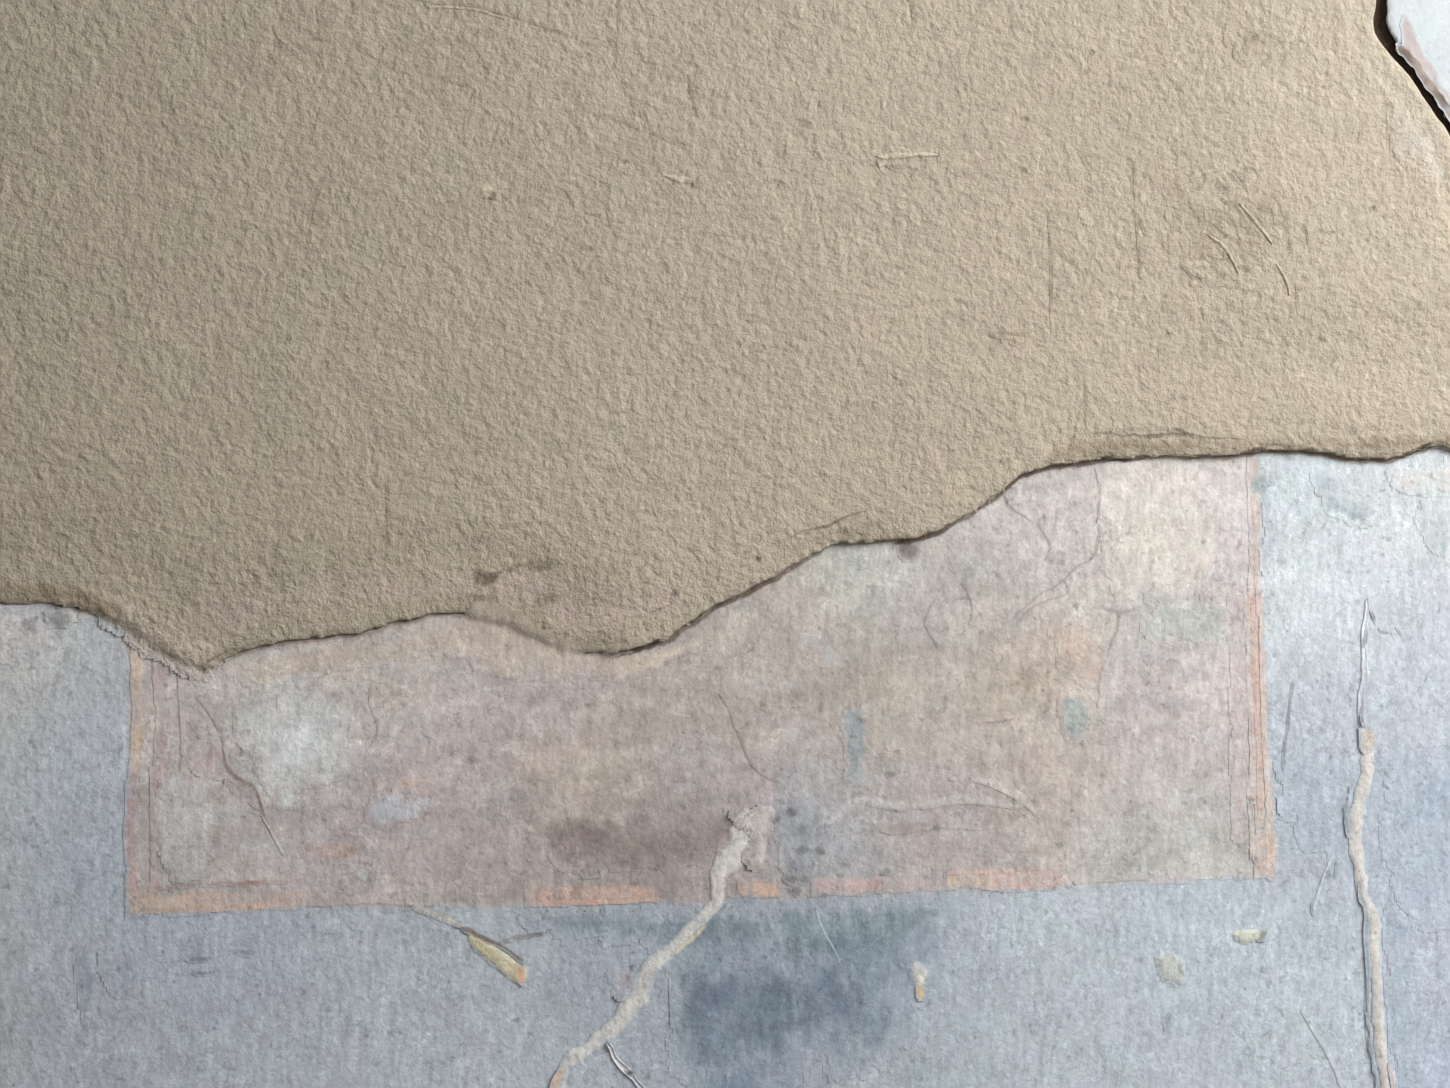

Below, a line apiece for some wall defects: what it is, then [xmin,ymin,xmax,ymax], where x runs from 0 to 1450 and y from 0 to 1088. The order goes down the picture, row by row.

spalling [1396,43,1450,122]
peeling [1401,441,1435,457]
spalling [467,557,561,604]
spalling [897,543,922,563]
peeling [232,688,362,811]
peeling [153,772,221,884]
peeling [825,775,1042,828]
crack [1342,598,1402,1088]
crack [549,692,783,1088]
spalling [412,905,549,986]
damp [517,792,957,1088]
spalling [908,960,930,1001]